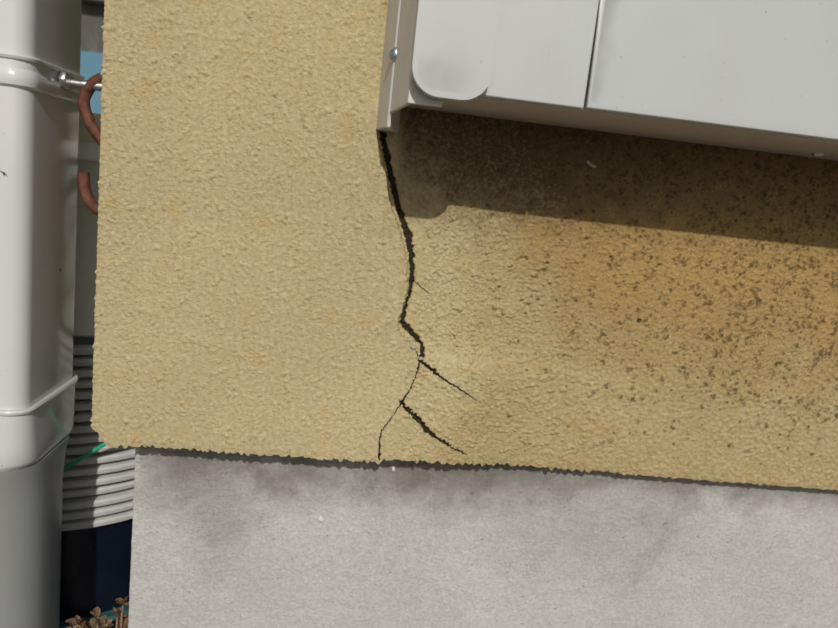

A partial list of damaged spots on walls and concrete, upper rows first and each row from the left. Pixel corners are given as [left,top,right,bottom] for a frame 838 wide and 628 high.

crack [378,131,476,460]
damp [506,124,838,401]